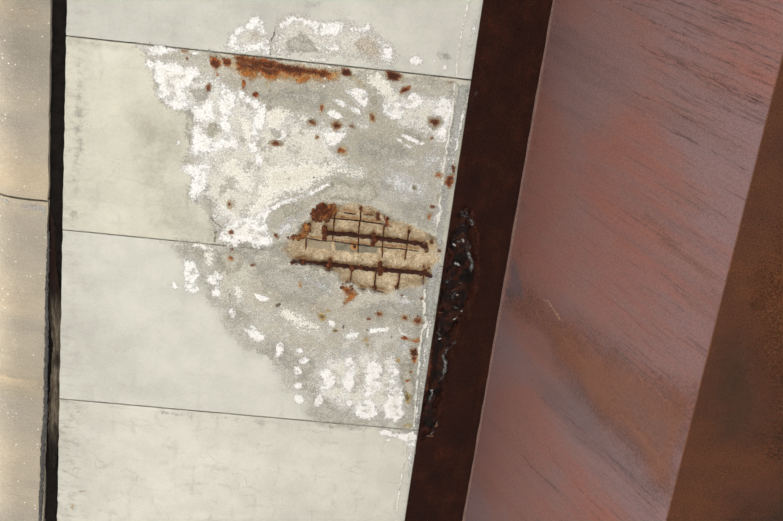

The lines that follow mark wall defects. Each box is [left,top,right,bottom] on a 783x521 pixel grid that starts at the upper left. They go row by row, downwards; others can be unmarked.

damp [136,43,179,57]
rust [210,54,351,99]
rust [386,71,411,96]
rust [306,104,325,140]
rust [330,121,355,130]
rust [427,116,444,140]
rust [434,165,455,188]
peeling [135,12,466,434]
damp [159,241,214,295]
damp [292,85,475,477]
damp [242,324,267,342]
rust [423,341,433,405]